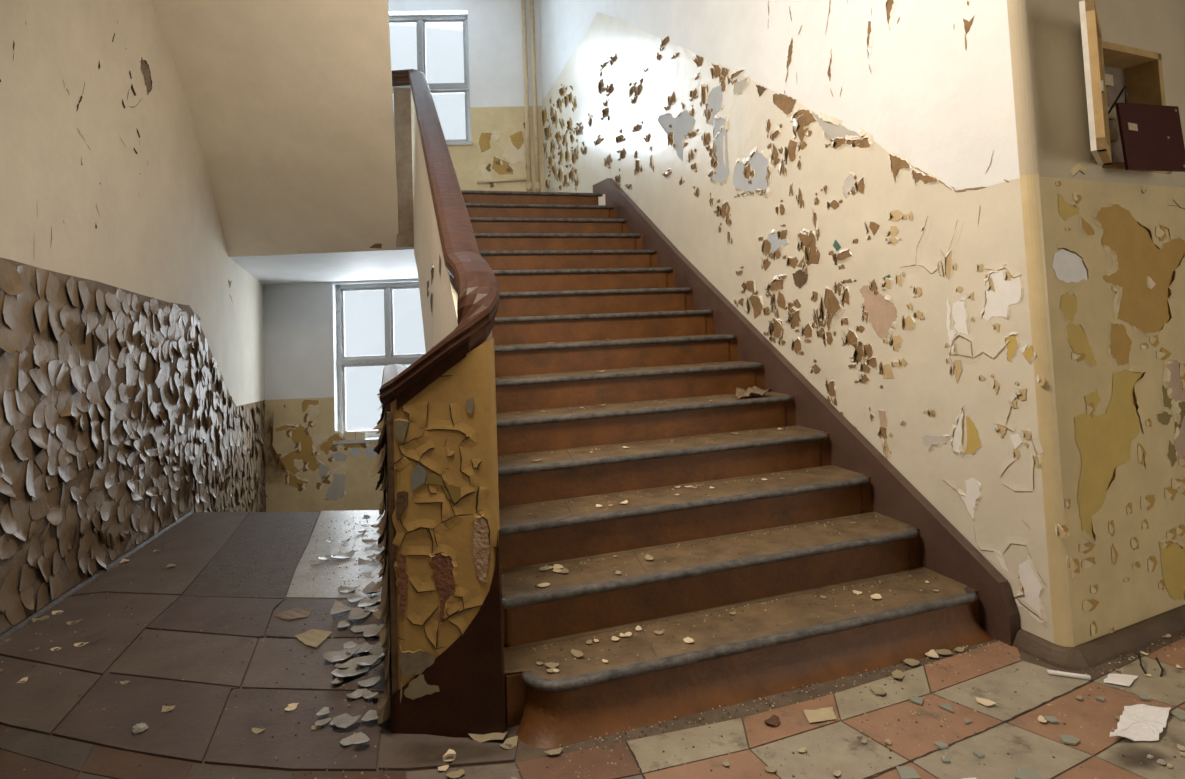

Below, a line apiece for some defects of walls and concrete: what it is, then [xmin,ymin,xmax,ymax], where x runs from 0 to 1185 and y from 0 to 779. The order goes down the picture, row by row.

peeling [866,0,900,72]
peeling [963,1,974,50]
peeling [478,122,532,188]
peeling [541,26,1046,460]
peeling [1052,181,1185,601]
peeling [0,255,461,724]
crack [392,368,499,649]
peeling [943,474,983,521]
flaking render [471,513,491,583]
peeling [993,549,1048,627]